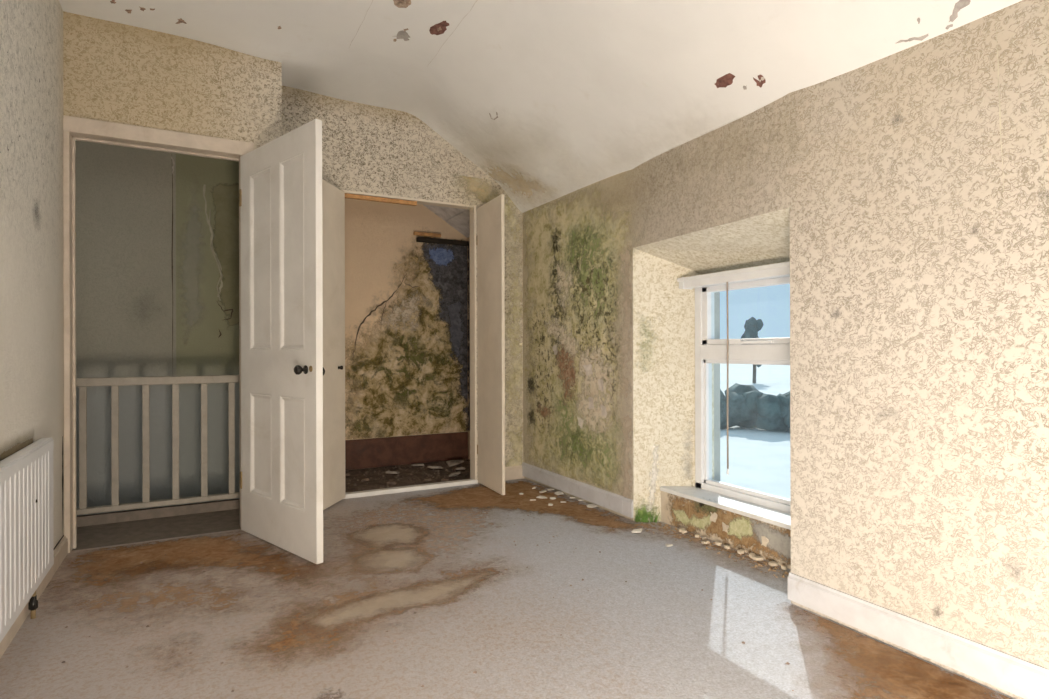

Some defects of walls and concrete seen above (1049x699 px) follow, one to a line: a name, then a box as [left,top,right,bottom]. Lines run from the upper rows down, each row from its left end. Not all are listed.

peeling [393,28,410,42]
peeling [393,0,411,8]
peeling [429,21,449,35]
peeling [946,0,971,29]
peeling [715,73,766,90]
flaking render [421,239,470,431]
water stain [464,173,631,497]
flaking render [667,494,791,566]